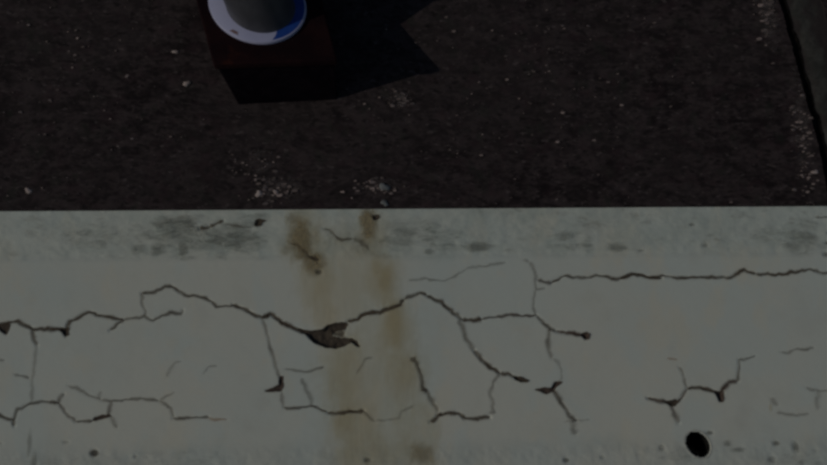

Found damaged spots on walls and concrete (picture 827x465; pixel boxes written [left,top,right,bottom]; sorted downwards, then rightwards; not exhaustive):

crack [538,268,827,284]
crack [0,285,303,344]
crack [347,292,582,336]
spalling [298,322,360,349]
crack [411,358,428,393]
crack [474,351,516,378]
crack [648,366,740,418]
crack [0,398,157,425]
crack [285,405,363,414]
crack [430,412,490,423]
crack [553,391,576,421]